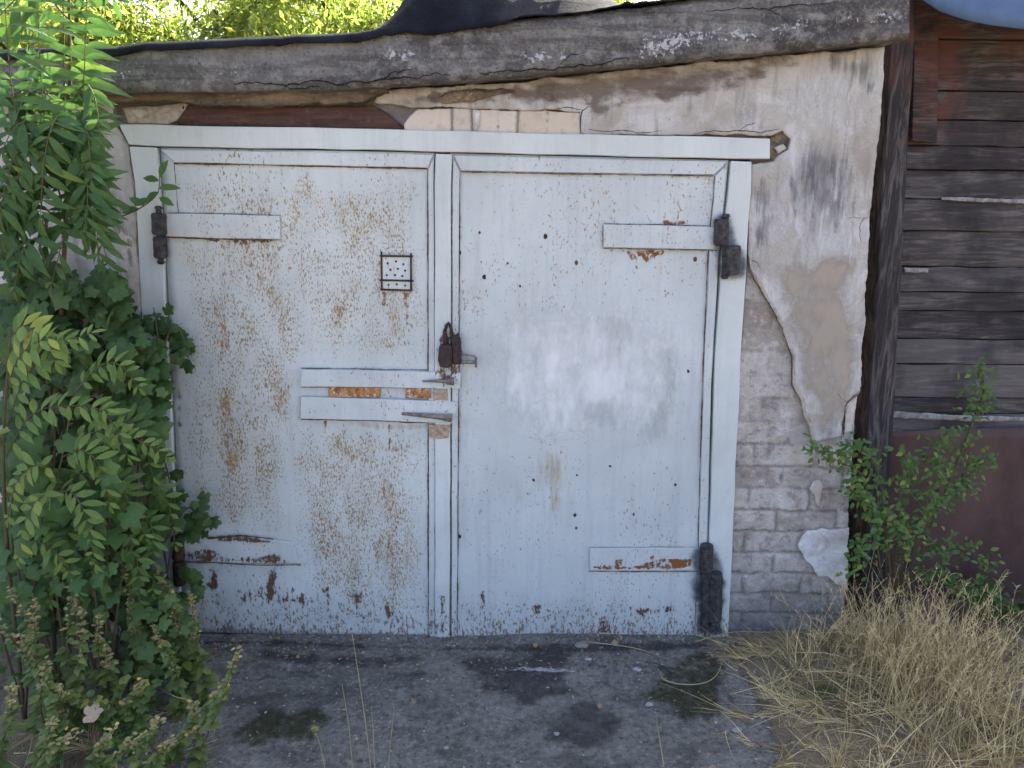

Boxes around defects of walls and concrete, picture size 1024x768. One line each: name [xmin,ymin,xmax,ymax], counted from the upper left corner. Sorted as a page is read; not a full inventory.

crack [480,52,629,75]
crack [234,69,447,90]
rust [623,250,664,269]
water stain [781,153,855,425]
rust [178,173,422,619]
spalling [728,255,857,636]
rust [594,556,691,570]